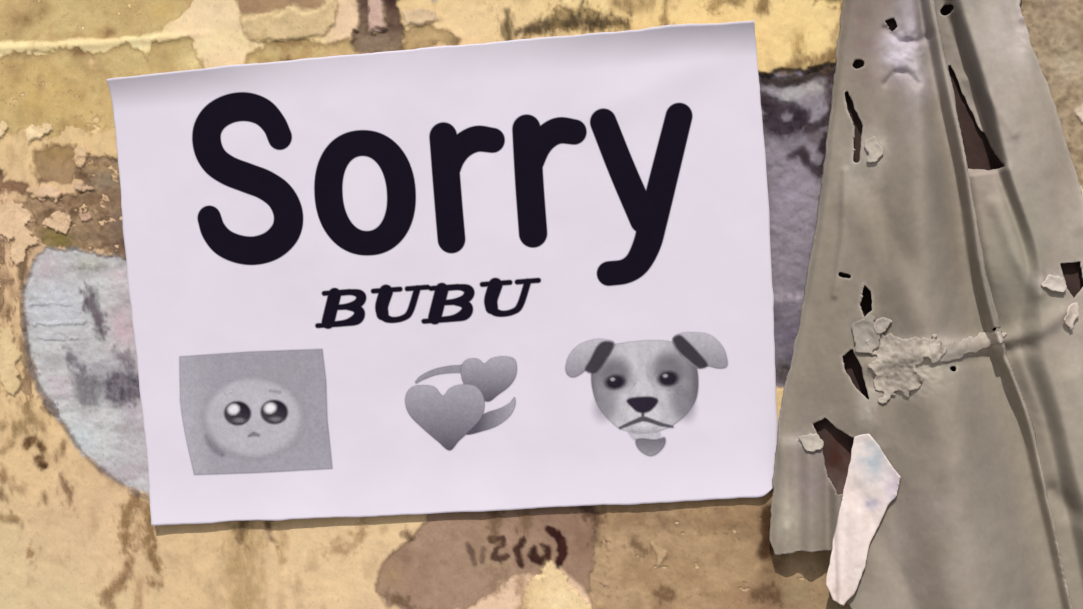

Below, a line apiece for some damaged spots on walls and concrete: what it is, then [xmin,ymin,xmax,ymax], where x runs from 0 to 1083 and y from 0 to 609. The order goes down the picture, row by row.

spalling [0,0,204,497]
spalling [758,63,836,388]
spalling [1020,0,1083,185]
water stain [100,495,163,609]